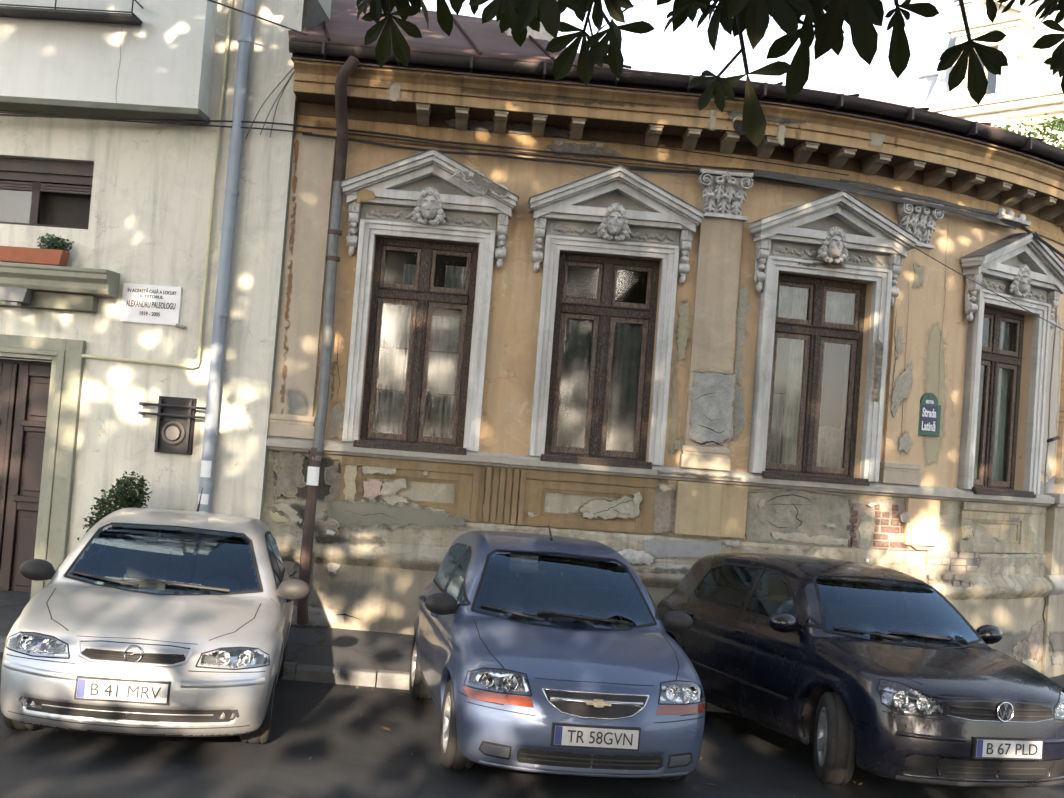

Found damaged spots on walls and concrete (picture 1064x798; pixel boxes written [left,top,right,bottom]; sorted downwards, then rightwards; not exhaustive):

peeling [912,264,924,289]
flaking render [688,286,750,447]
peeling [870,327,912,417]
flaking render [269,503,385,544]
peeling [343,465,407,502]
flaking render [743,488,980,588]